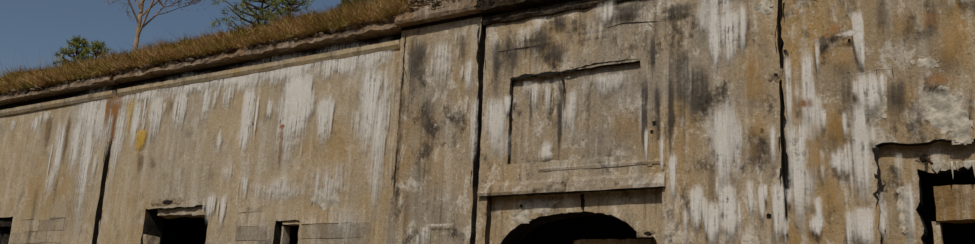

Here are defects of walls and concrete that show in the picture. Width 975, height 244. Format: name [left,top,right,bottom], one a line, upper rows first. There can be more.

leakage [662,0,746,64]
rust [105,95,122,142]
leakage [32,35,472,210]
leakage [641,51,710,194]
crack [775,0,790,244]
leakage [683,12,905,244]
leakage [203,195,226,224]
crack [872,147,886,207]
leakage [906,185,914,231]
leakage [932,160,975,177]